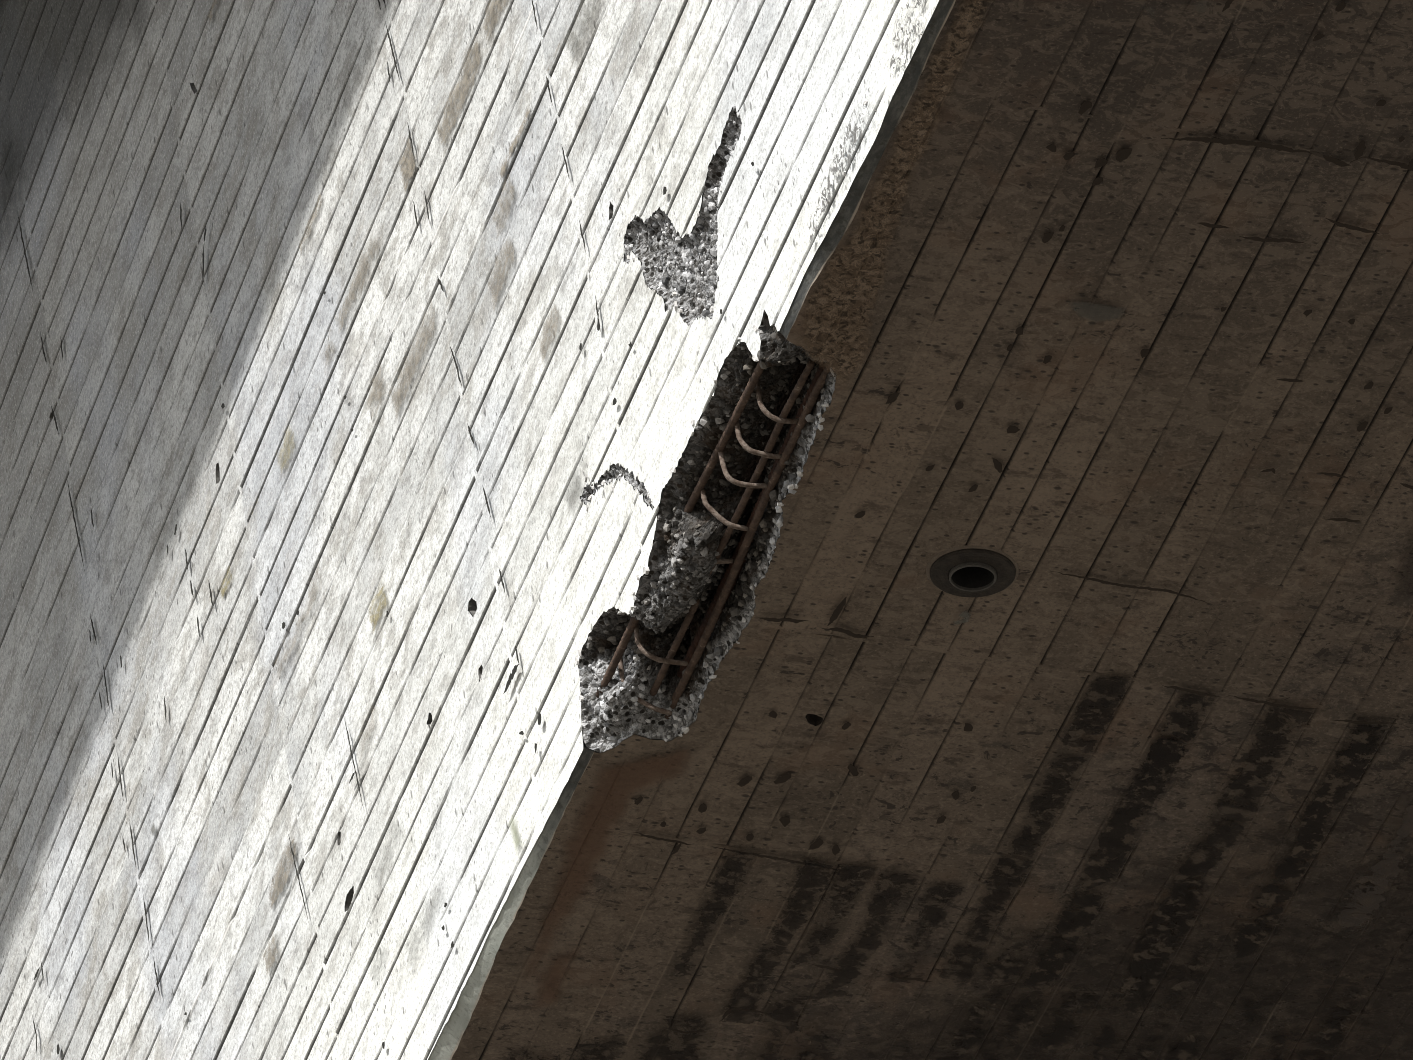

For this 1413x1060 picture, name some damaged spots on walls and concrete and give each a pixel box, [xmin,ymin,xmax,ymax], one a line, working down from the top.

spalling [621,106,742,326]
crack [1161,137,1413,171]
spalling [575,310,837,752]